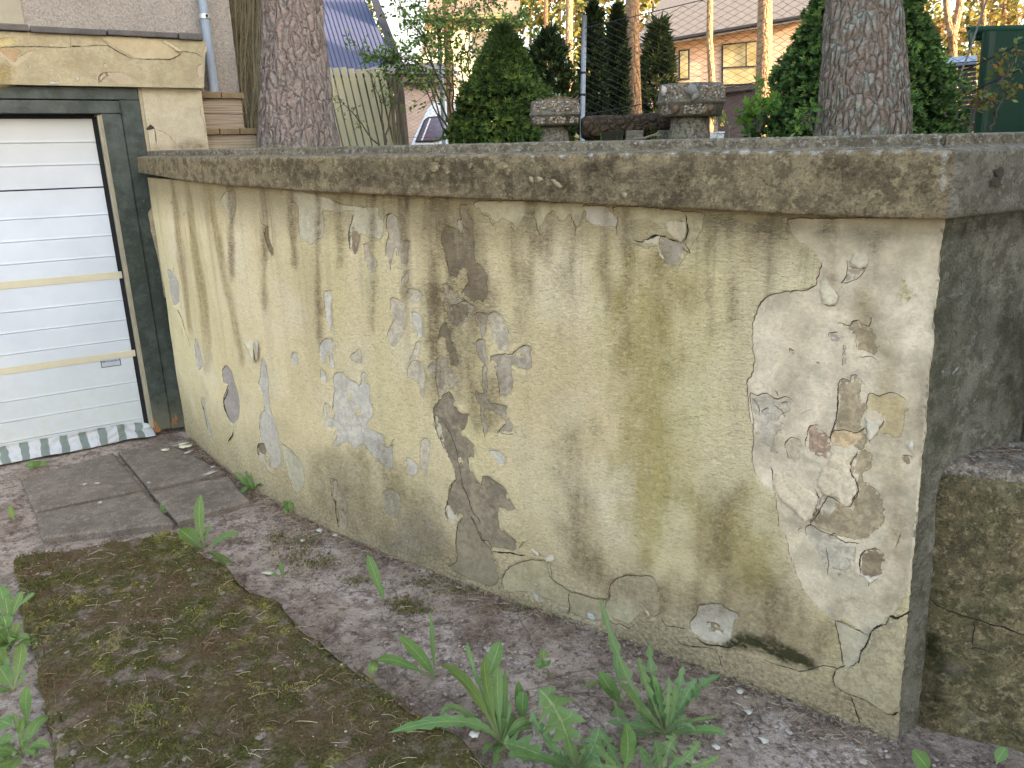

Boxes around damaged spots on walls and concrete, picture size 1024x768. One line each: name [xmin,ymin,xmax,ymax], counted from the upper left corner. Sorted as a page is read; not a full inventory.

peeling [222,365,240,424]
peeling [244,340,305,493]
peeling [280,175,705,586]
peeling [746,217,945,667]
peeling [598,575,660,641]
spalling [690,603,738,648]
crack [763,599,1024,727]